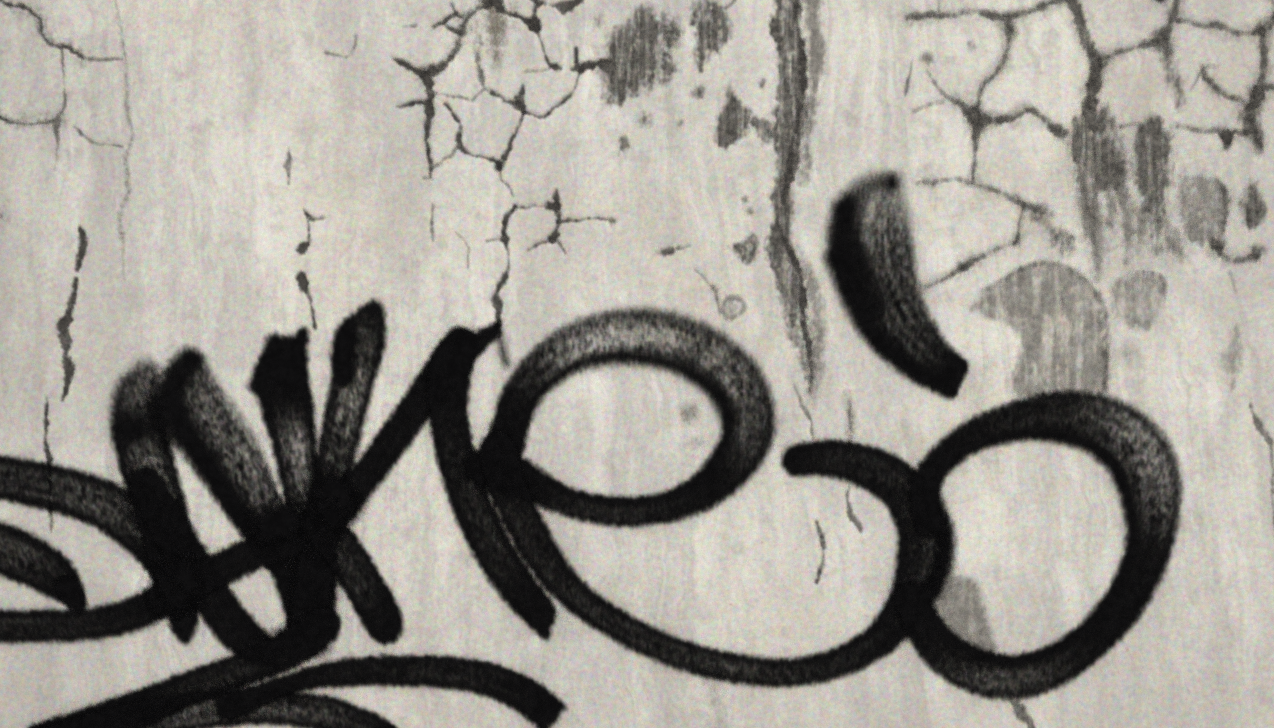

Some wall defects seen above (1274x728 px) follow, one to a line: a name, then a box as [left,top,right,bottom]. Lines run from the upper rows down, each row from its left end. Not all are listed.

crack [0,0,121,146]
crack [284,152,292,184]
crack [394,0,615,320]
crack [905,0,1274,244]
crack [925,254,985,287]
crack [1211,240,1256,273]
crack [44,226,87,464]